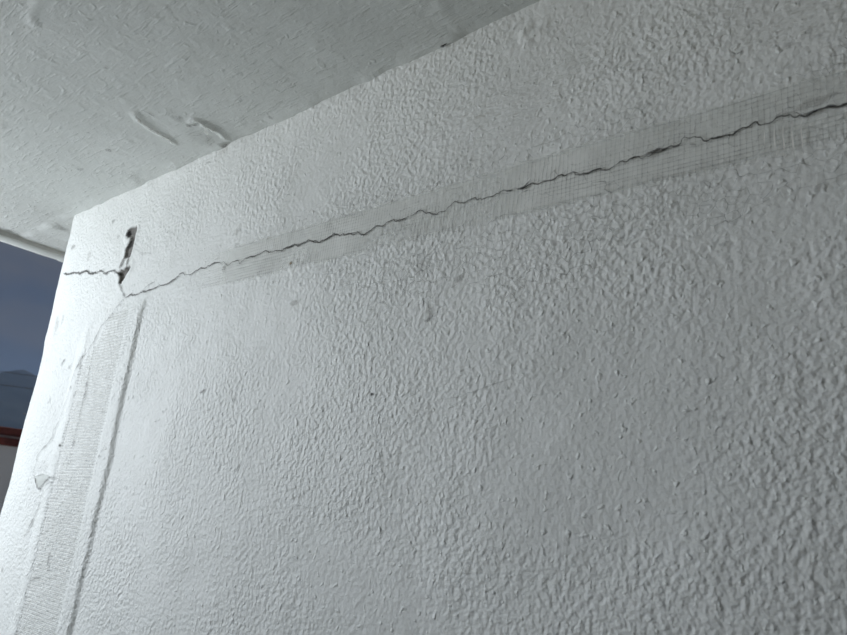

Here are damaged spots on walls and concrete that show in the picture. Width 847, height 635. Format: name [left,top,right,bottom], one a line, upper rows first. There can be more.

crack [127,103,847,297]
crack [64,268,122,276]
flaking render [118,227,137,284]